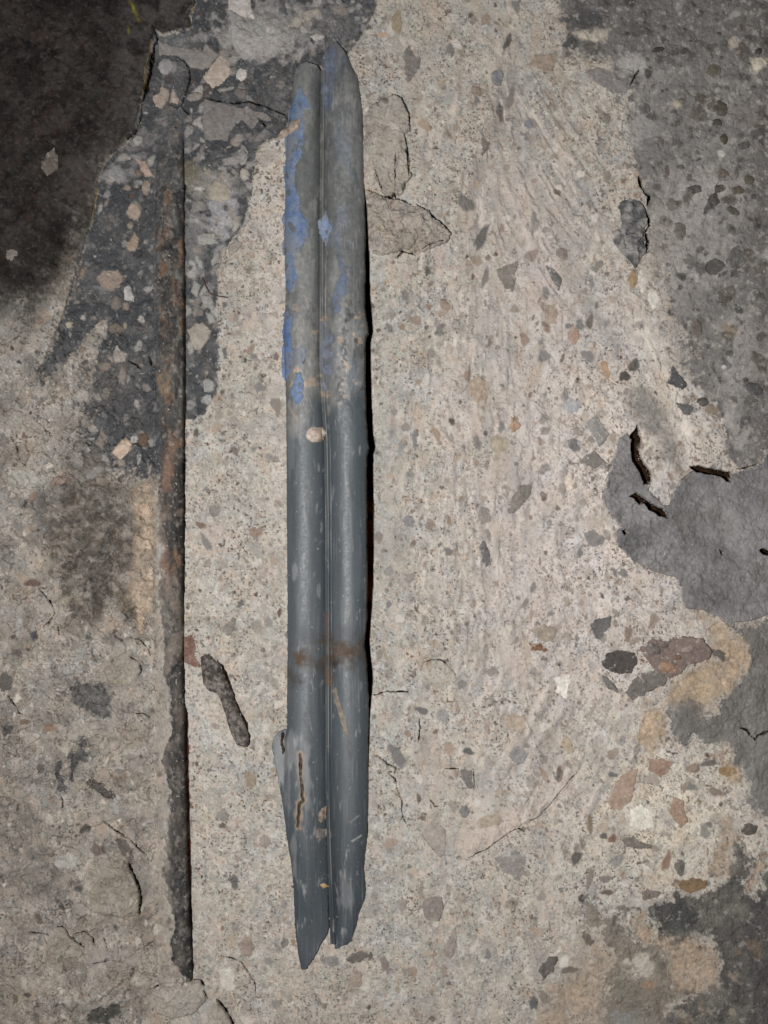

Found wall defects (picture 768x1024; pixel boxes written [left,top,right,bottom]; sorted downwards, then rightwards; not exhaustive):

leakage [0,0,117,189]
leakage [0,211,60,278]
spalling [36,0,378,488]
crack [365,97,448,730]
spalling [557,0,768,822]
corrosion [184,635,201,667]
crack [469,774,575,858]